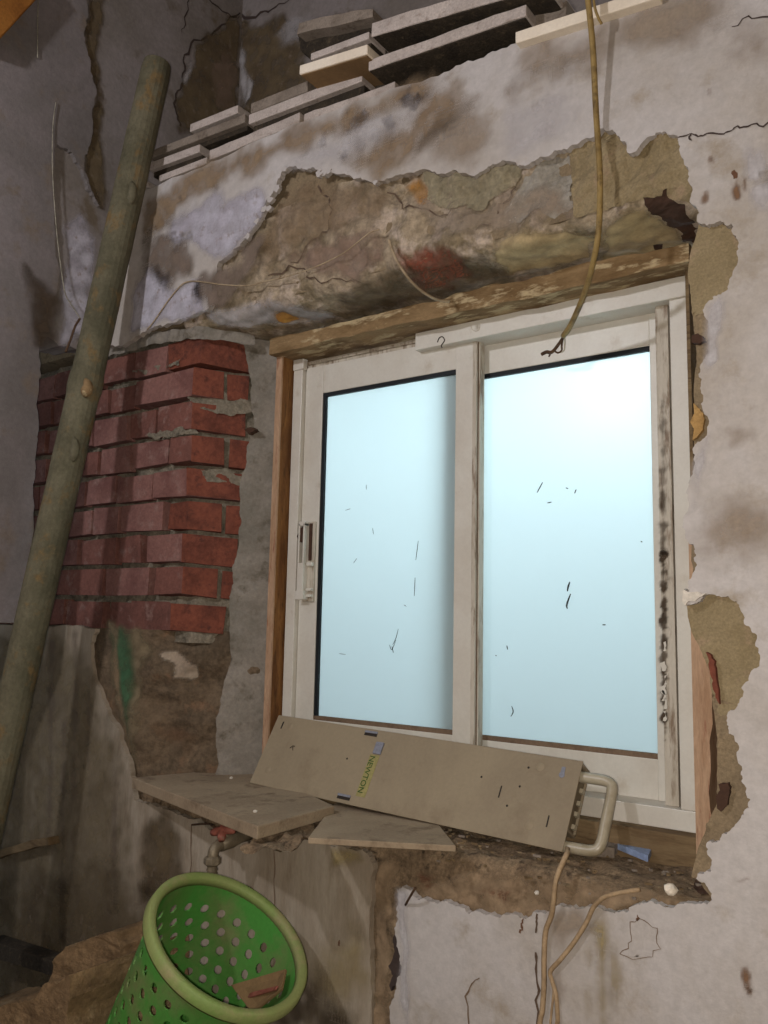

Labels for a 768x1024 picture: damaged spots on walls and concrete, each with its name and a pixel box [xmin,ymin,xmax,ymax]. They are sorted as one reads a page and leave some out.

crack [173,0,289,126]
crack [678,122,768,141]
peeling [244,166,289,241]
water stain [131,82,496,331]
crack [268,185,361,284]
crack [387,192,451,217]
peeling [570,132,739,446]
peeling [112,630,133,719]
peeling [682,589,760,878]
peeling [417,871,697,917]